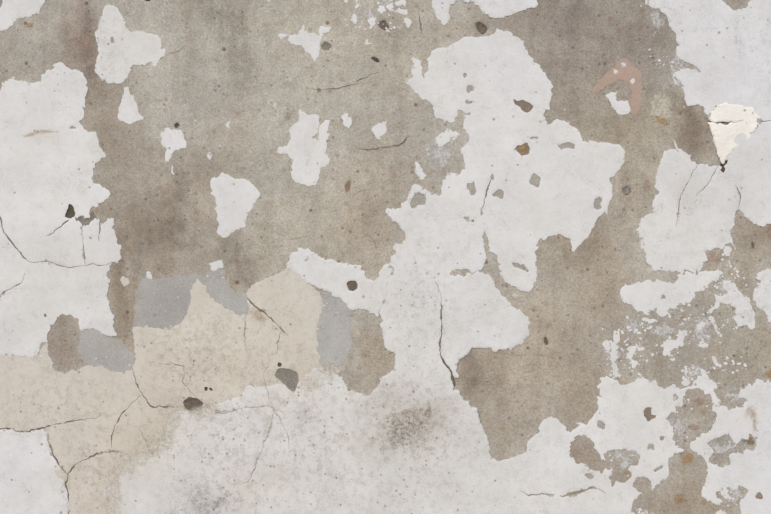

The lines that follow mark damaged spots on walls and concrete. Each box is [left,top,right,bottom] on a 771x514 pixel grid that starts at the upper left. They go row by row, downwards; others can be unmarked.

peeling [0,0,538,374]
crack [0,217,112,296]
peeling [453,0,771,514]
crack [244,298,283,350]
peeling [320,309,396,396]
crack [438,287,456,387]
crack [0,363,289,514]